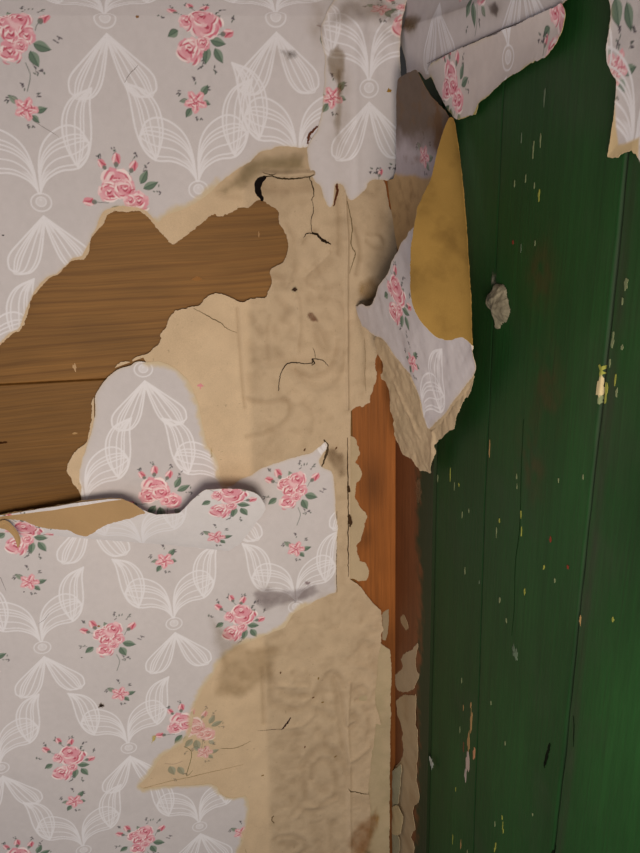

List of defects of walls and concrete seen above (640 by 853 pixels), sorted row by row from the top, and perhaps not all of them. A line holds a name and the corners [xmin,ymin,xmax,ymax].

crack [261,172,356,273]
crack [278,349,328,391]
peeling [140,146,403,853]